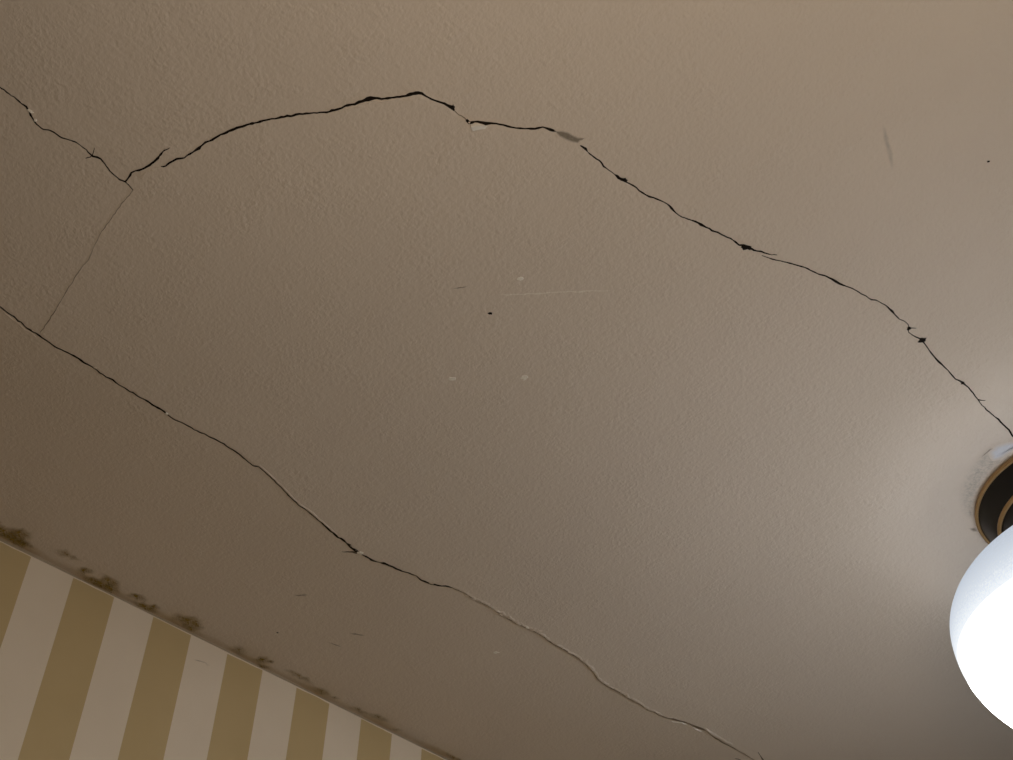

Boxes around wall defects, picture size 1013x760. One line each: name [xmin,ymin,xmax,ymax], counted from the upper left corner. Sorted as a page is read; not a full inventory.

crack [0,87,764,760]
crack [580,145,1013,437]